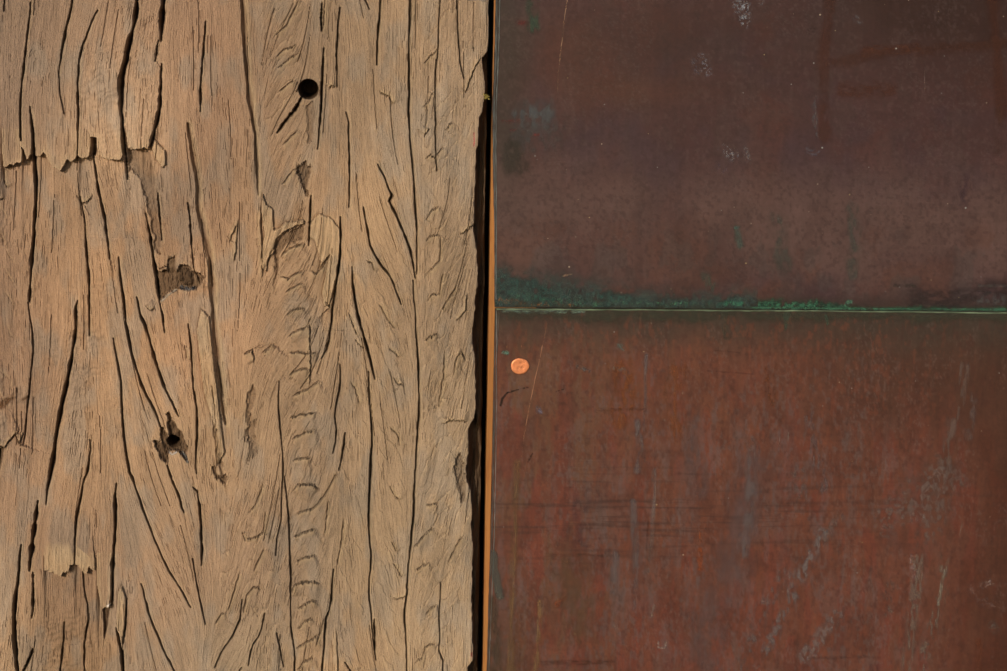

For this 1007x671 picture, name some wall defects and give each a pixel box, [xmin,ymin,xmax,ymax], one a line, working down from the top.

crack [0,3,39,460]
crack [12,0,227,671]
crack [215,381,296,671]
crack [240,0,465,671]
leakage [495,273,1007,321]